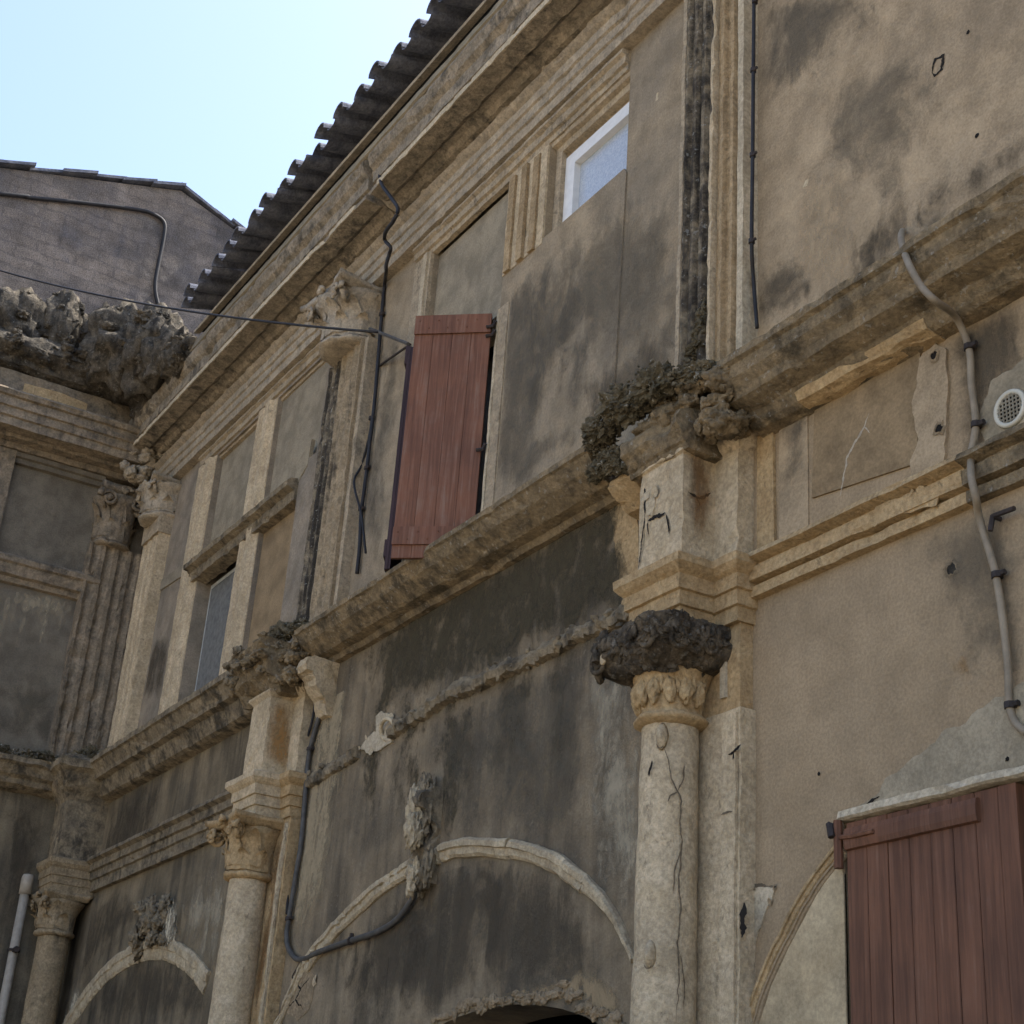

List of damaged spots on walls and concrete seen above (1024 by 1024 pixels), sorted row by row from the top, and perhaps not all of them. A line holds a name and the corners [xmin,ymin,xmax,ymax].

leakage [772,3,851,81]
leakage [763,176,847,309]
leakage [498,274,572,481]
crack [840,414,870,495]
crack [638,488,670,568]
leakage [370,505,625,714]
leakage [294,691,345,925]
leakage [363,751,380,795]
leakage [593,680,637,881]
leakage [356,870,581,1003]
crack [648,747,685,1020]